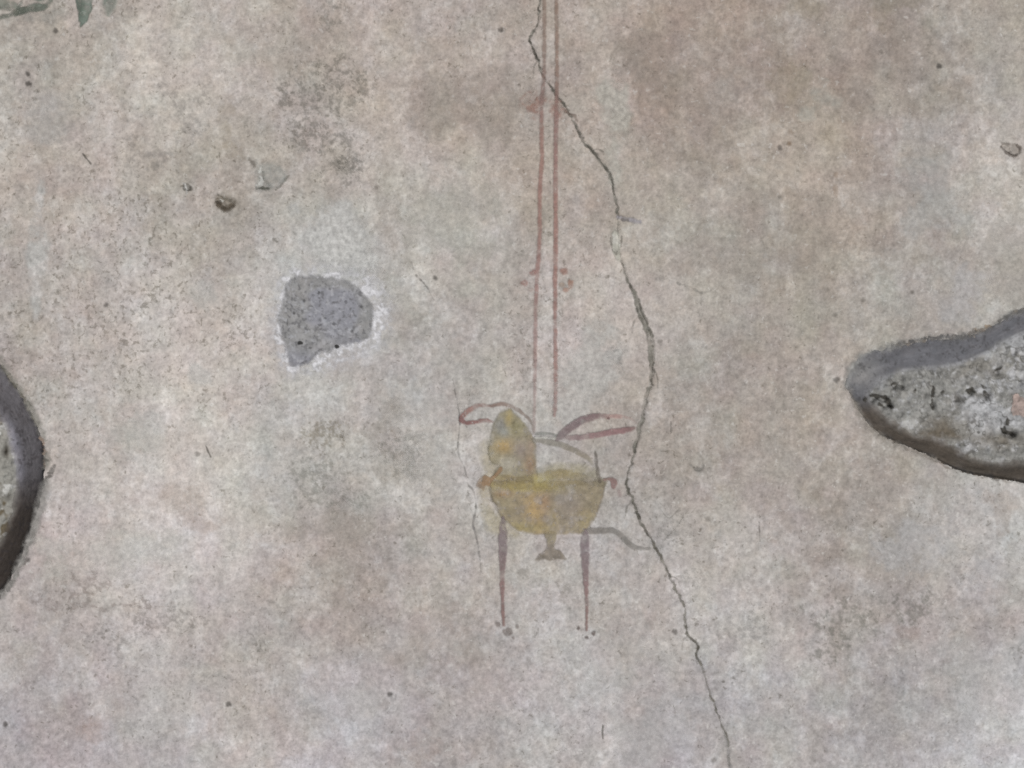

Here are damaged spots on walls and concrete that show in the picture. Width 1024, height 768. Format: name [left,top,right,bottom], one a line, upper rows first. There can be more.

spalling [0,365,55,597]
crack [529,0,702,665]
spalling [845,308,1024,483]